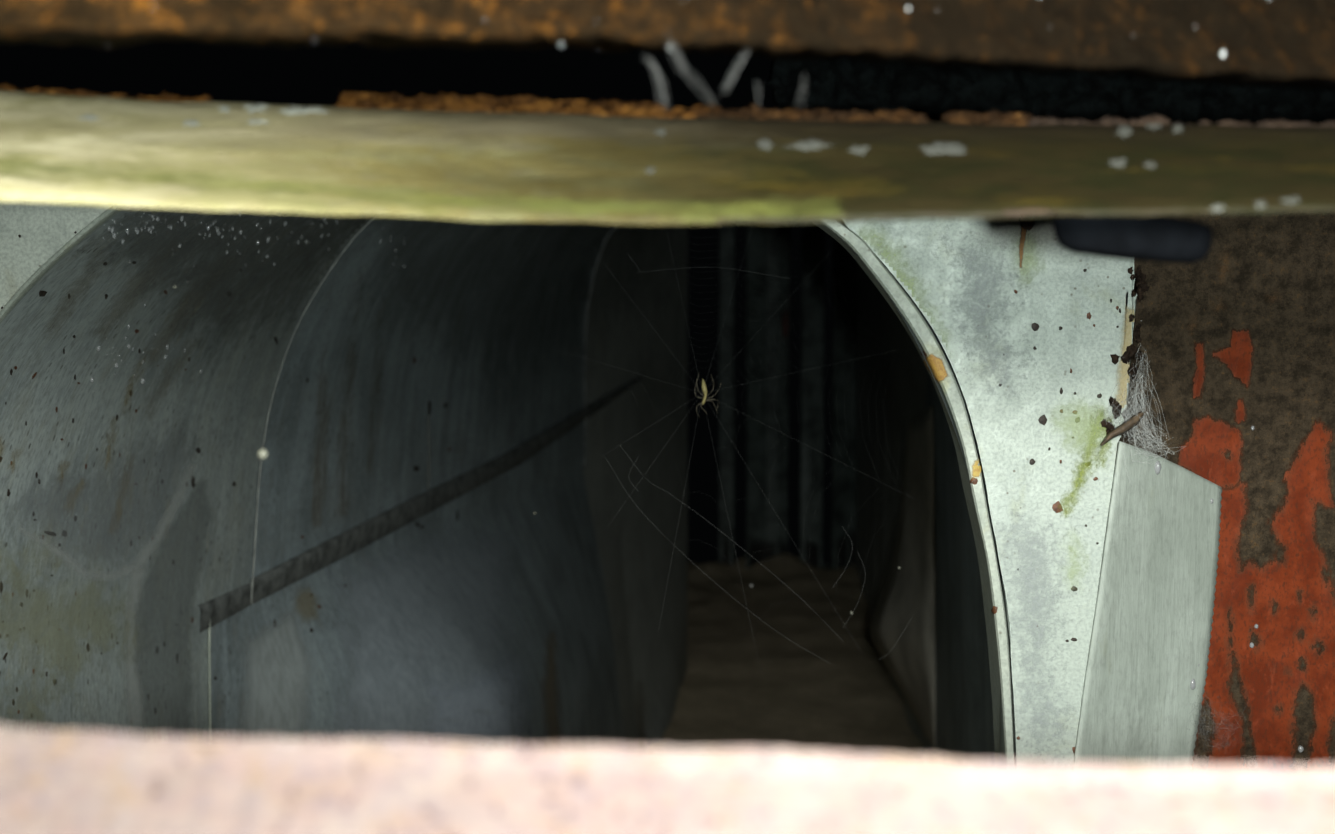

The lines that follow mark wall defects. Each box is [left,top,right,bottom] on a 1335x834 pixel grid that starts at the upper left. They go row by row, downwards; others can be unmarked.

damp [1063,411,1108,514]